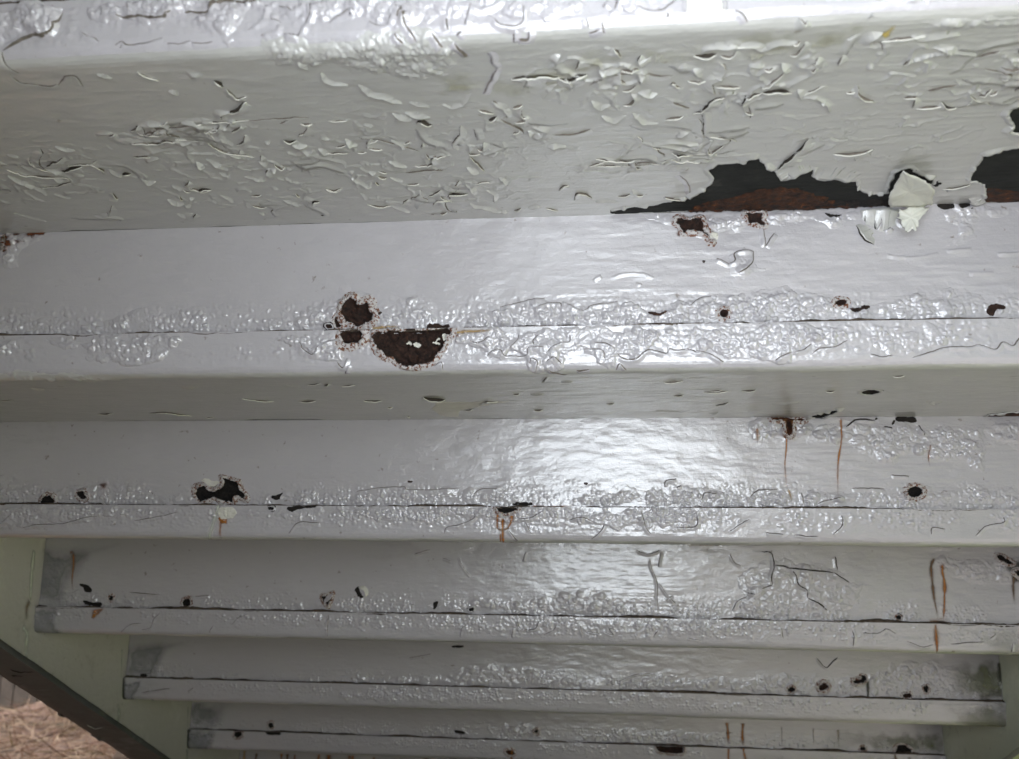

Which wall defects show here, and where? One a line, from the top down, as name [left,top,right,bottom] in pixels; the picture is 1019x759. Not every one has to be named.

peeling [511,17,825,139]
peeling [559,79,1019,244]
corrosion [0,233,44,252]
peeling [420,377,573,417]
corrosion [496,515,513,543]
crack [501,511,544,568]
crack [569,516,608,541]
crack [664,478,717,531]
crack [727,474,909,613]
crack [930,526,945,535]
crack [975,516,1008,538]
crack [635,511,676,638]